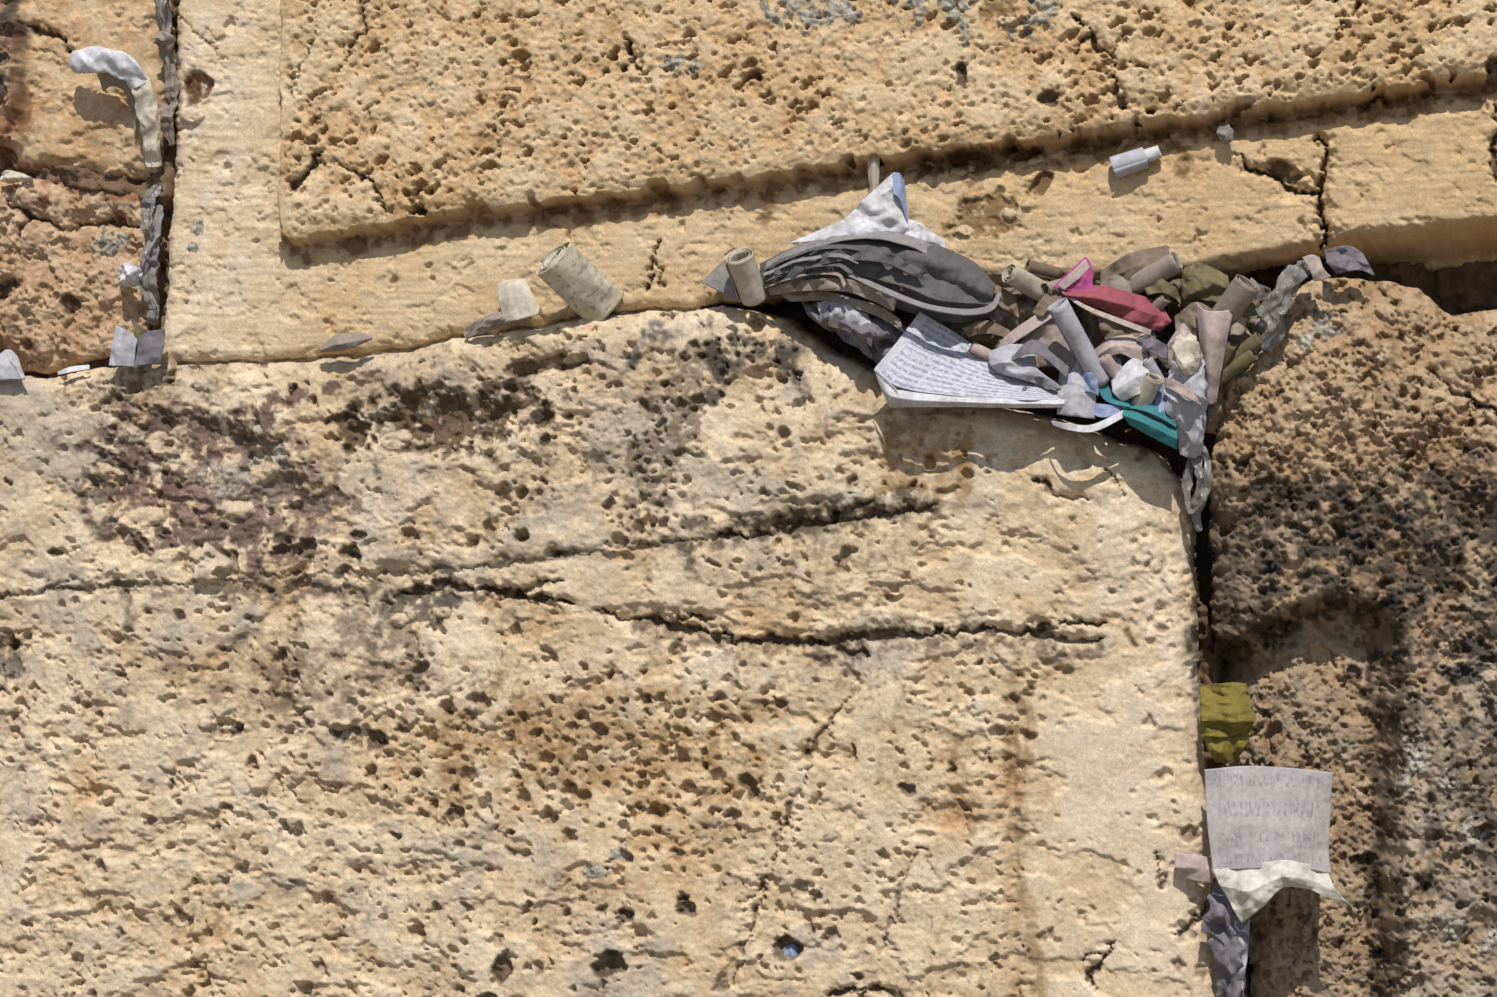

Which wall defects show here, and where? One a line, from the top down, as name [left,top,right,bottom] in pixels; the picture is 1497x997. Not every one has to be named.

crack [1489,106,1497,180]
crack [291,152,386,210]
crack [1245,138,1328,250]
crack [724,501,936,537]
crack [416,577,1106,657]